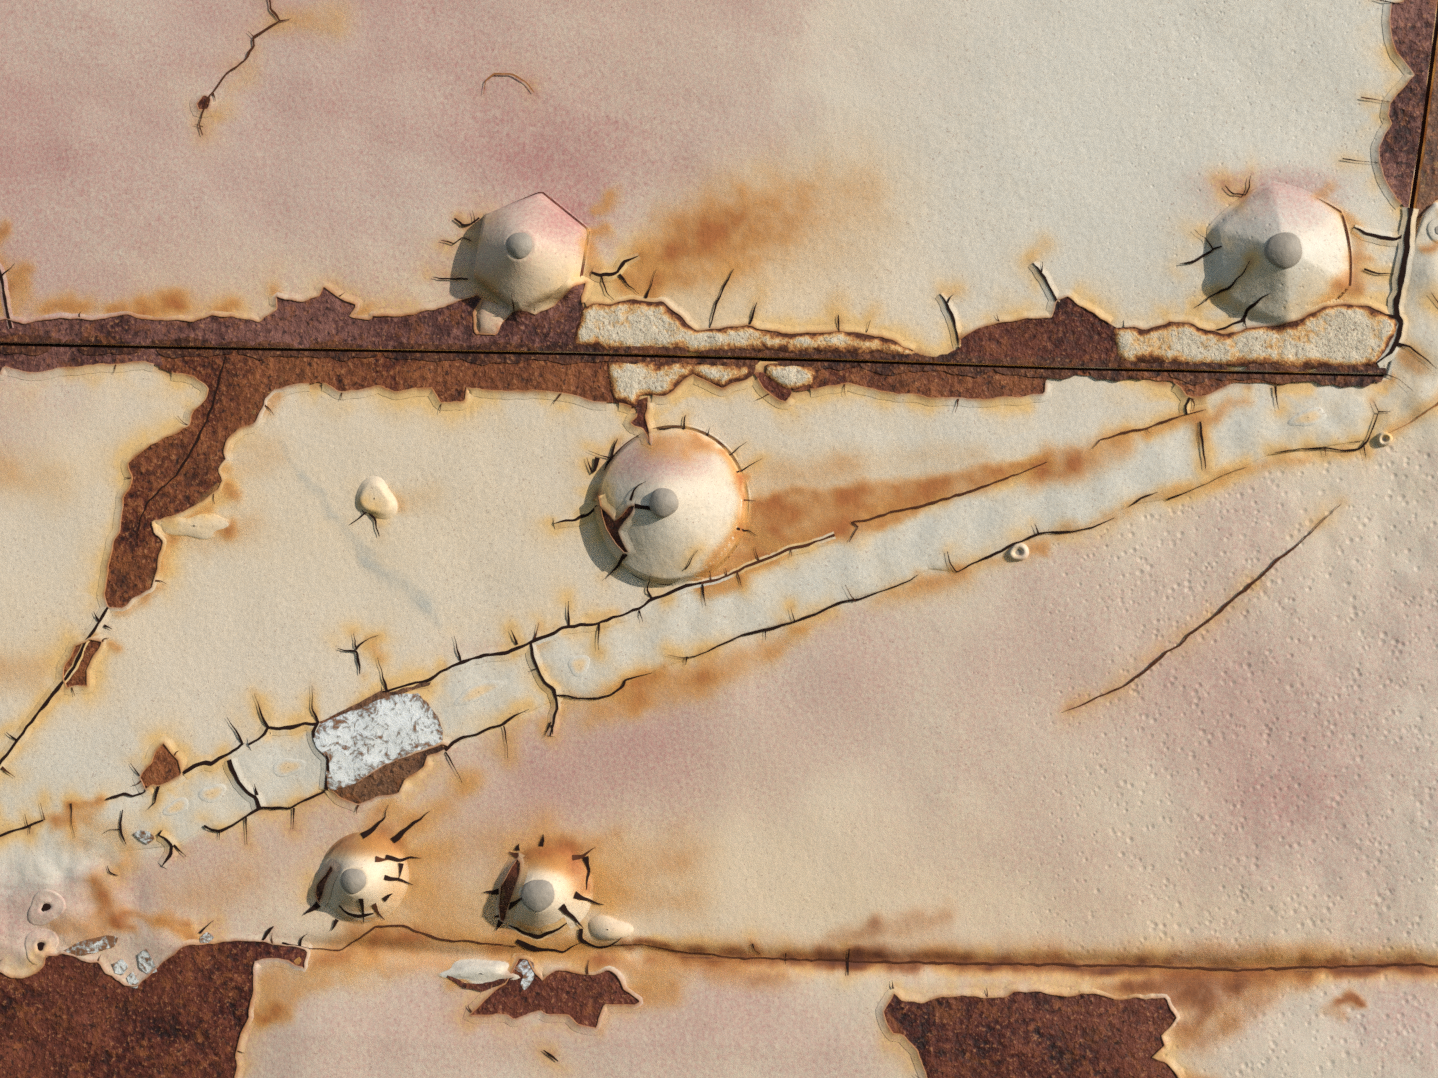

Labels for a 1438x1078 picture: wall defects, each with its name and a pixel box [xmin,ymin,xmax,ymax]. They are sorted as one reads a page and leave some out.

rust [1371,0,1438,219]
rust [0,183,1386,616]
crack [947,207,1438,572]
crack [0,607,112,776]
rust [132,735,187,797]
crack [0,693,330,876]
rust [318,682,431,724]
rust [325,736,457,859]
crack [337,415,1047,782]
rust [0,834,1438,1078]
crack [262,807,1438,989]
crack [1064,504,1341,712]